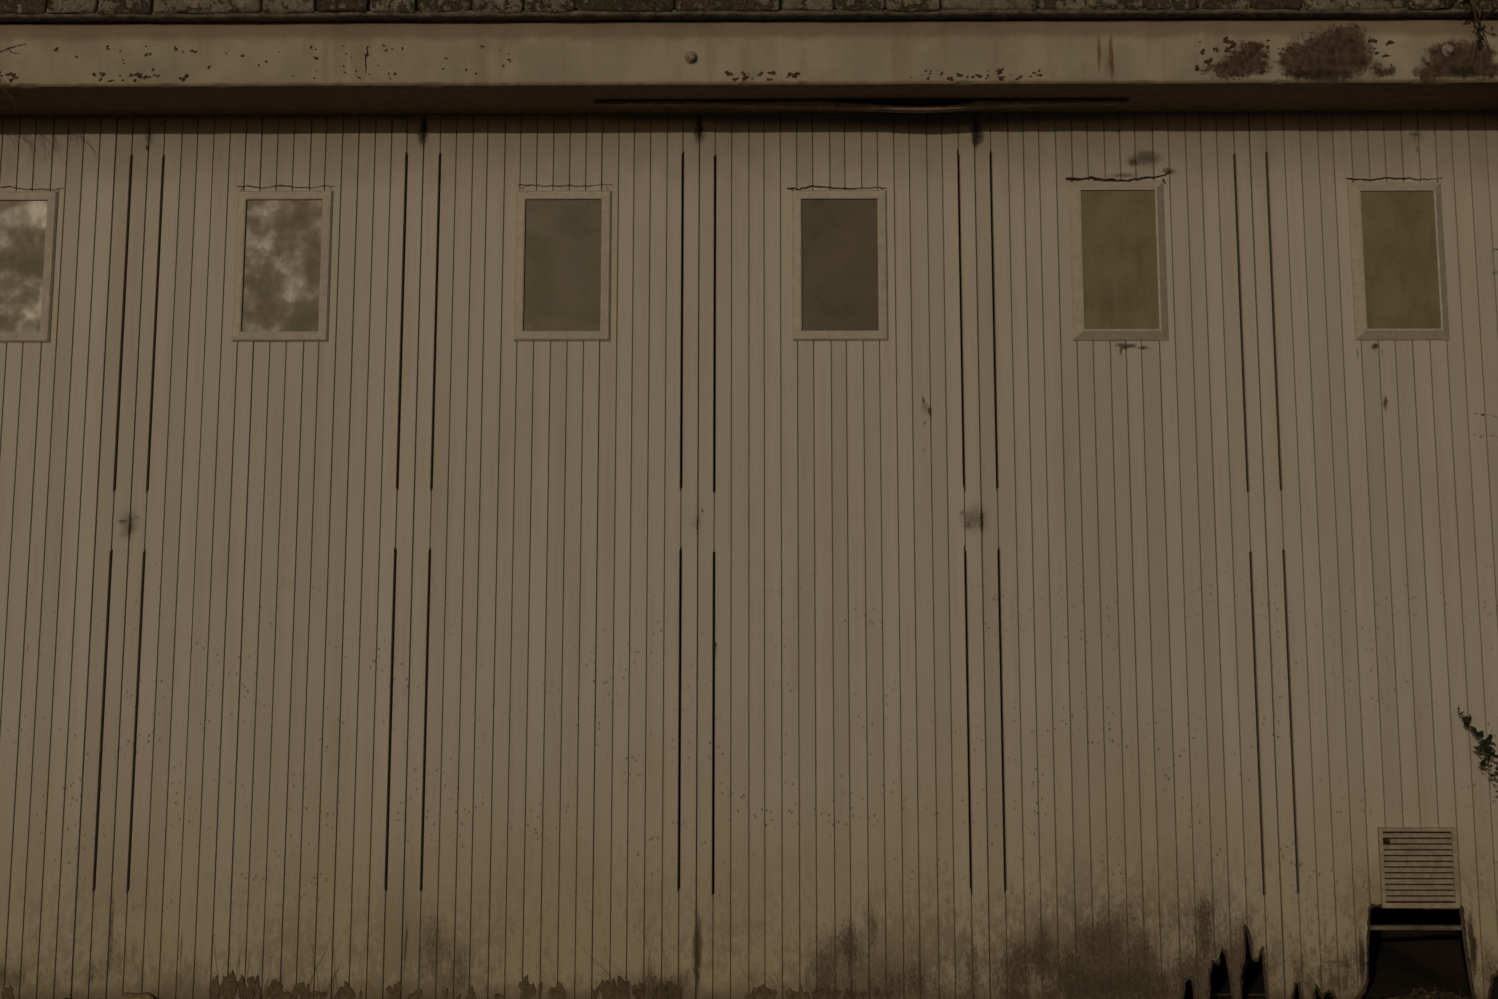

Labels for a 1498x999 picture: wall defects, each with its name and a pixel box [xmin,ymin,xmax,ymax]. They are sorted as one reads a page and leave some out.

rust [1204,25,1396,83]
rust [1414,40,1498,82]
water stain [642,930,700,999]
water stain [1004,902,1274,999]